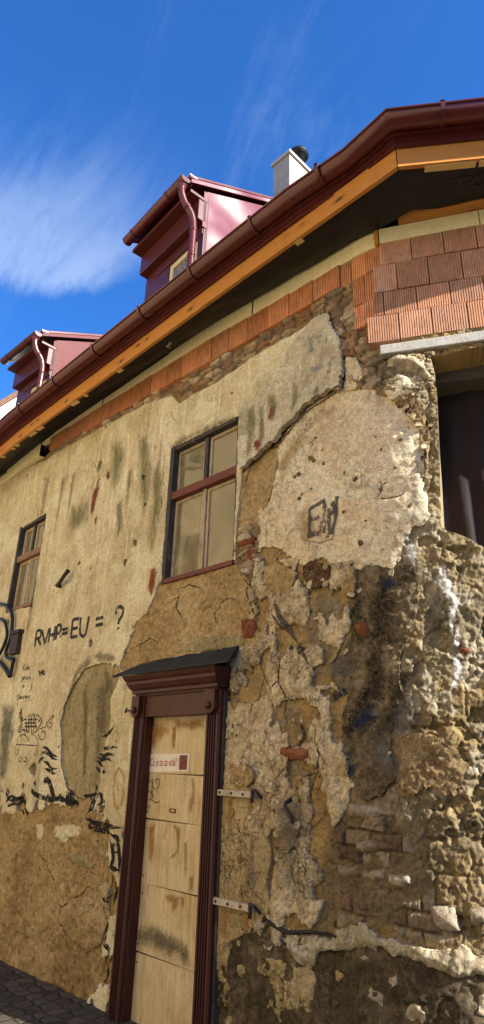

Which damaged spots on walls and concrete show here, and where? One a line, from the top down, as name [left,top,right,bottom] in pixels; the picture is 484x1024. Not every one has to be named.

spalling [394,392,433,480]
leakage [60,474,88,525]
leakage [113,440,163,542]
spalling [237,446,279,534]
crack [171,575,290,731]
leakage [344,654,413,775]
spalling [0,556,469,1000]
crack [290,729,325,817]
crack [38,845,97,936]
spalling [217,929,484,1024]